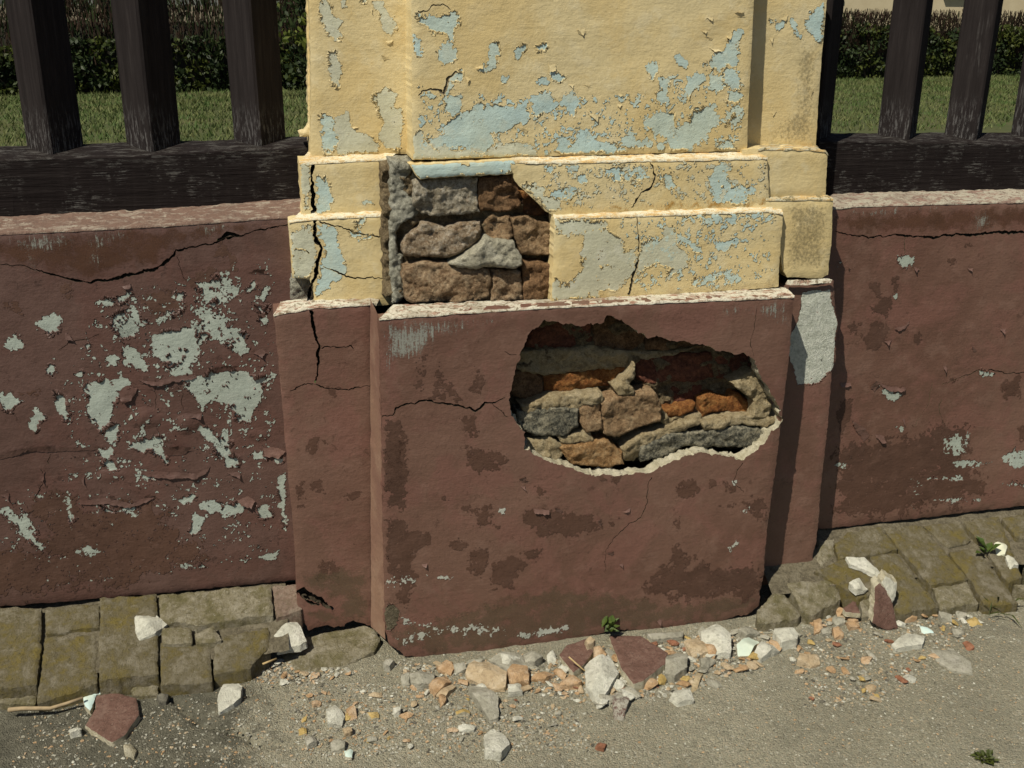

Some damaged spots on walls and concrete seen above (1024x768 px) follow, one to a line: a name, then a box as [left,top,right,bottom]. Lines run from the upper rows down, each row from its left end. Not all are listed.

peeling [768,2,825,43]
flaking render [290,0,779,304]
crack [0,224,288,284]
crack [291,165,383,391]
crack [627,162,656,295]
flaking render [789,254,923,386]
crack [836,230,1024,250]
peeling [0,259,328,603]
crack [382,397,507,417]
flaking render [509,315,775,485]
peeling [676,474,769,522]
leakage [401,617,569,646]